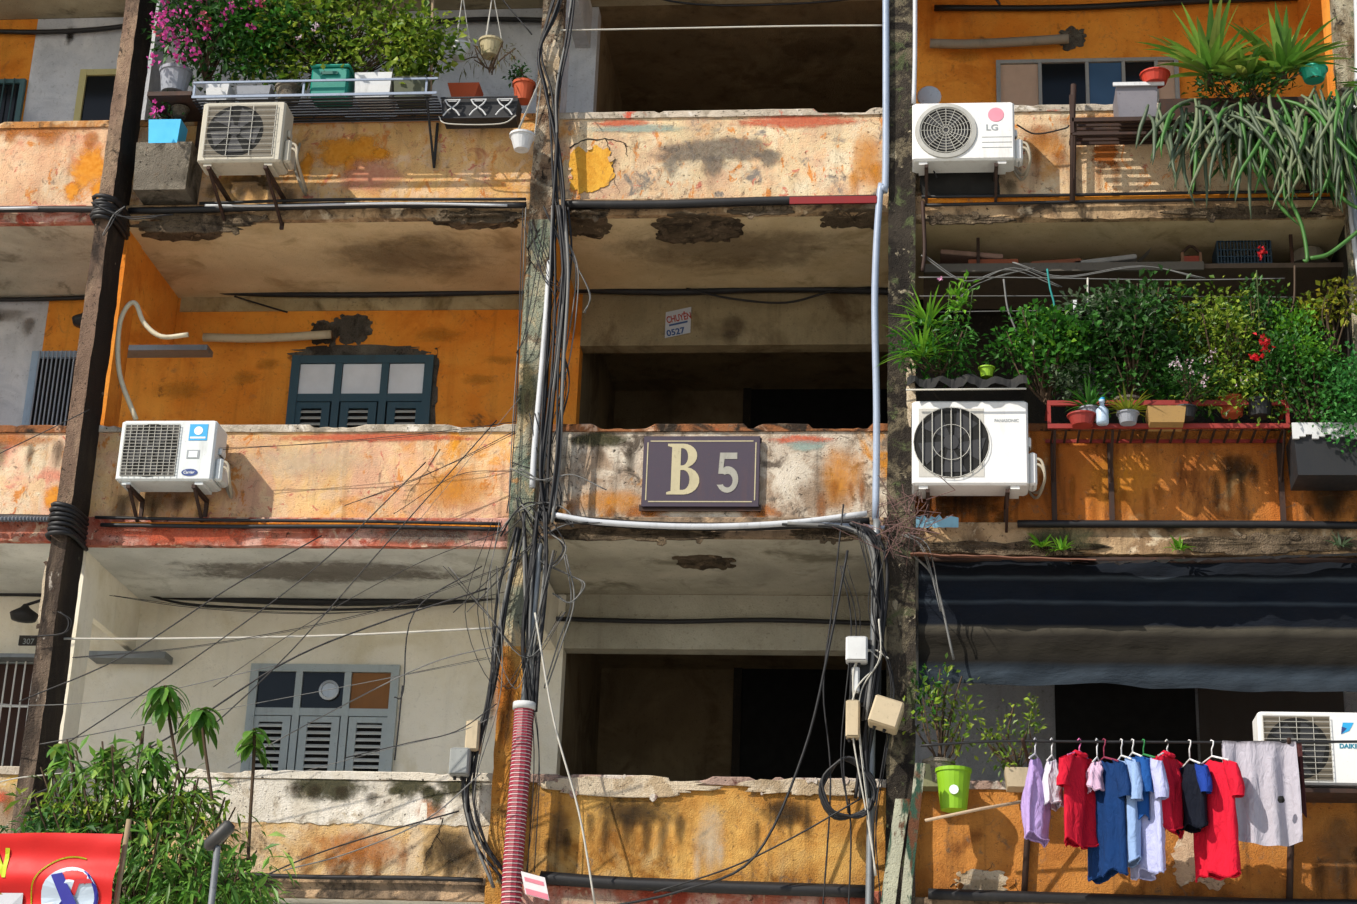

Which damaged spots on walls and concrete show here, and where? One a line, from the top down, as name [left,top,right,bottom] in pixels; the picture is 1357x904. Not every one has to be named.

leakage [703,157,722,175]
peeling [556,145,615,236]
spalling [128,213,270,235]
spalling [427,208,524,230]
leakage [1215,457,1256,493]
spalling [548,526,721,560]
leakage [423,786,444,809]
spalling [538,774,859,802]
leakage [604,802,682,842]
leakage [770,801,808,825]